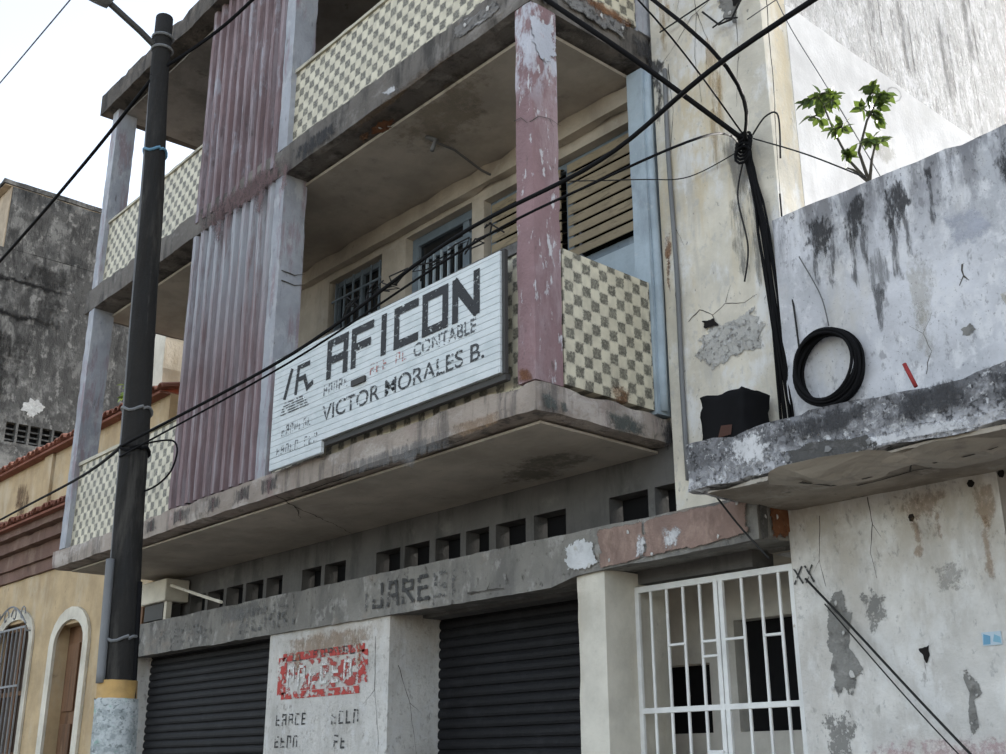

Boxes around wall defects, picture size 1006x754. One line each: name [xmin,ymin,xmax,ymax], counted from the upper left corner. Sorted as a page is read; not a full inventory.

spalling [530,15,557,63]
damp [805,193,868,285]
damp [884,181,911,276]
damp [25,264,67,329]
flaking render [694,306,765,370]
damp [661,421,673,446]
damp [781,396,874,438]
damp [855,379,982,452]
spalling [564,501,748,570]
spalling [827,590,863,697]
spalling [822,710,857,754]
spalling [963,670,982,735]